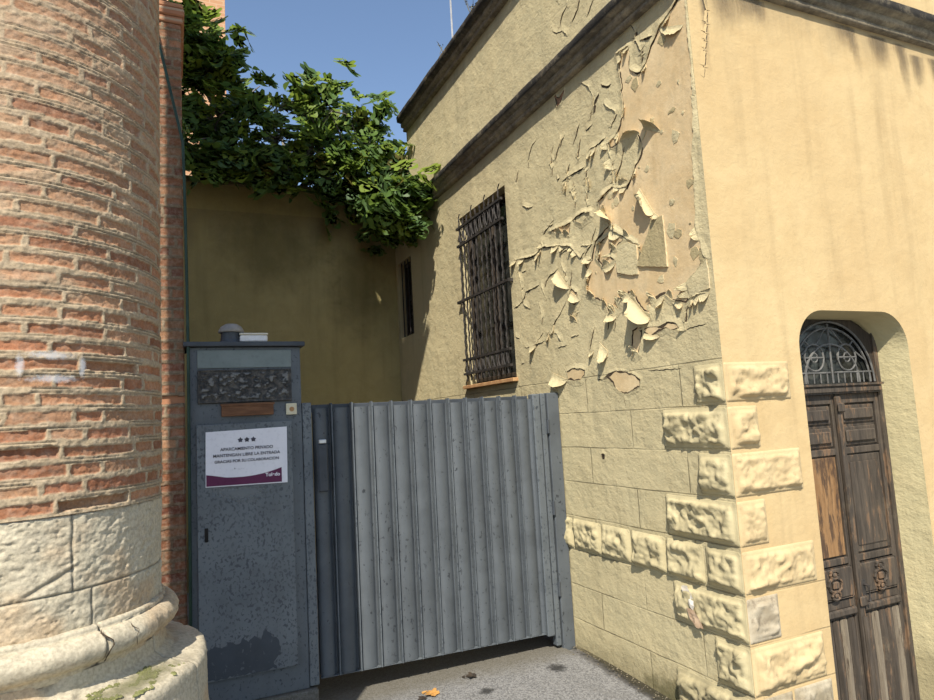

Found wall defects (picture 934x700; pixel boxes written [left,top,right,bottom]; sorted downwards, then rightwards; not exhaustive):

peeling [509,0,711,397]
crack [100,630,115,662]